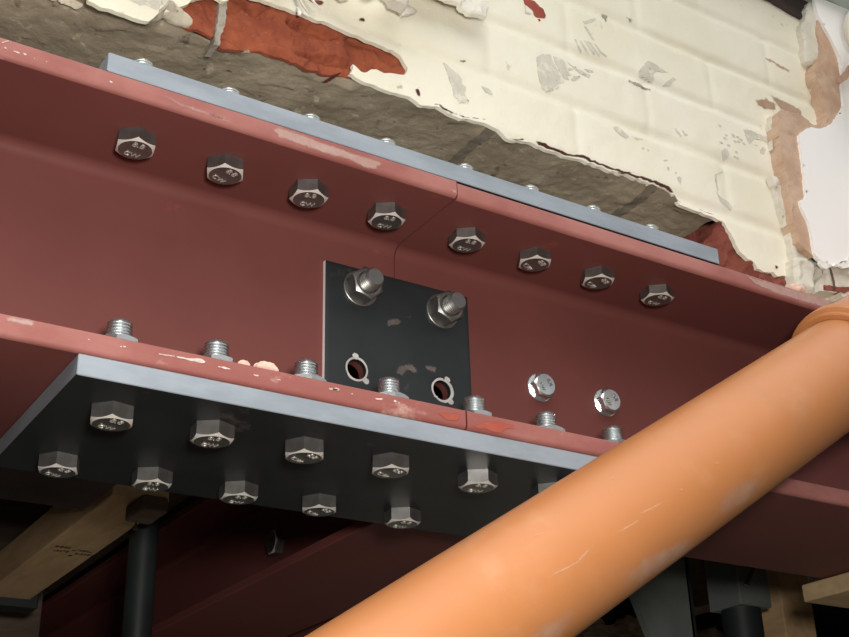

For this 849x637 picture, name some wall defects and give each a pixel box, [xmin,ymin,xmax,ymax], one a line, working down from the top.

flaking render [439,0,489,20]
peeling [523,0,546,21]
spalling [131,0,405,79]
peeling [443,63,469,104]
peeling [536,54,594,93]
peeling [638,61,676,87]
flaking render [686,1,849,302]